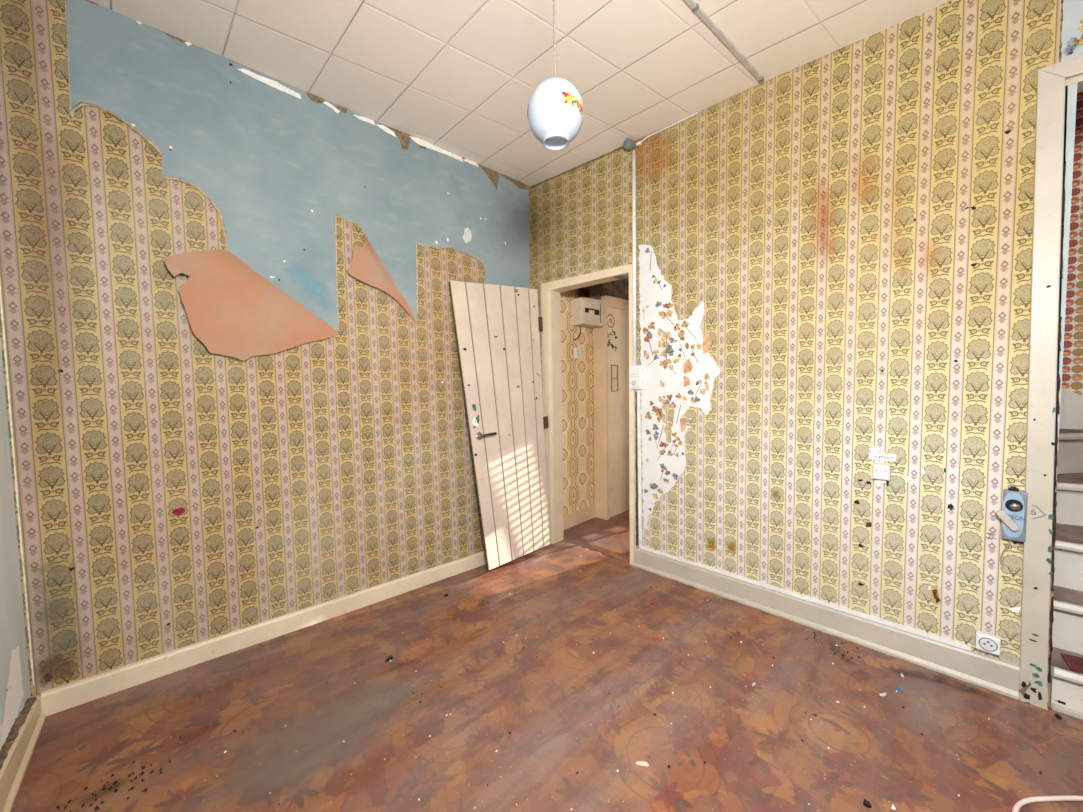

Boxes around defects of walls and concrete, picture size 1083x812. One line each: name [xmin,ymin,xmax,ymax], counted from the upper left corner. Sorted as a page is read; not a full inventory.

peeling [65,0,530,361]
peeling [638,244,722,545]